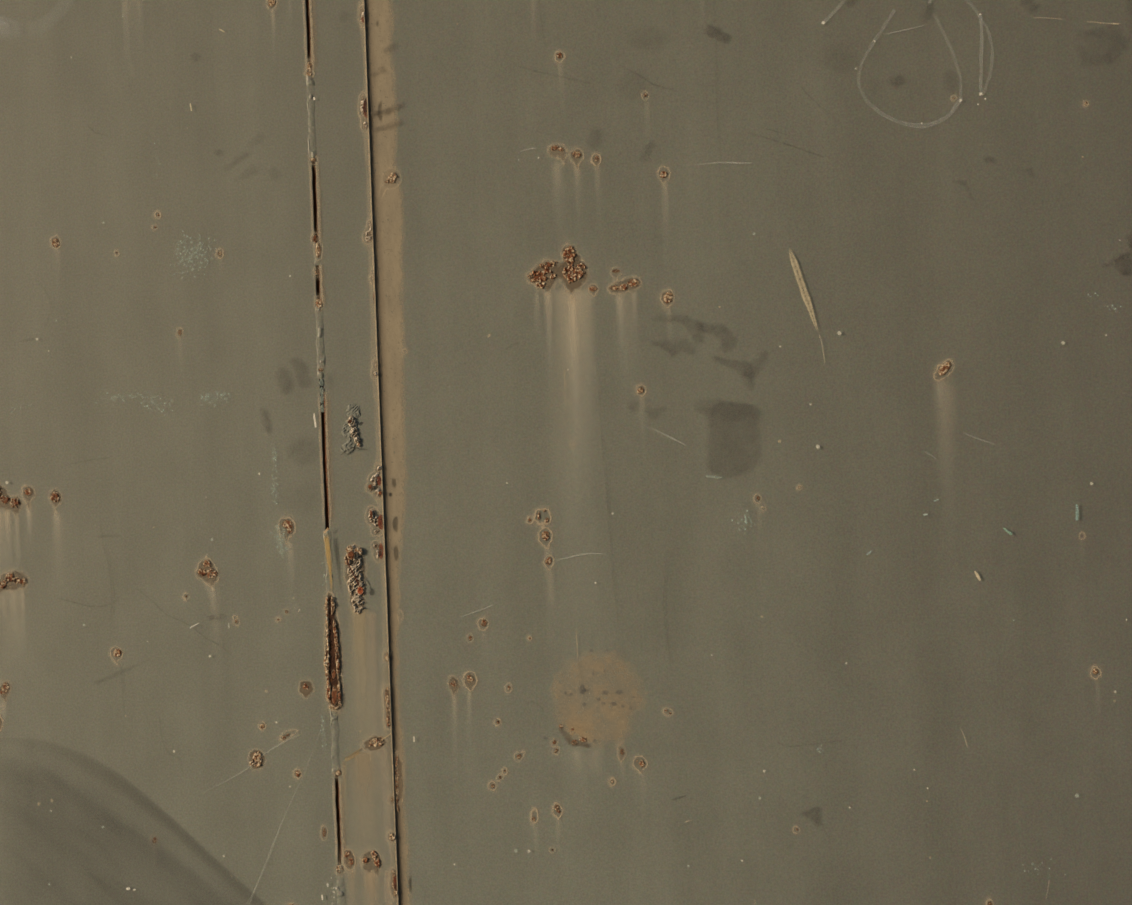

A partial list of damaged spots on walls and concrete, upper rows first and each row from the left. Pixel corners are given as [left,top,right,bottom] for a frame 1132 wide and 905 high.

corrosion [527,245,639,344]
corrosion [341,0,409,905]
corrosion [0,485,33,521]
corrosion [527,508,553,570]
corrosion [0,571,27,591]
corrosion [197,559,218,590]
corrosion [323,592,343,710]
corrosion [249,750,264,769]